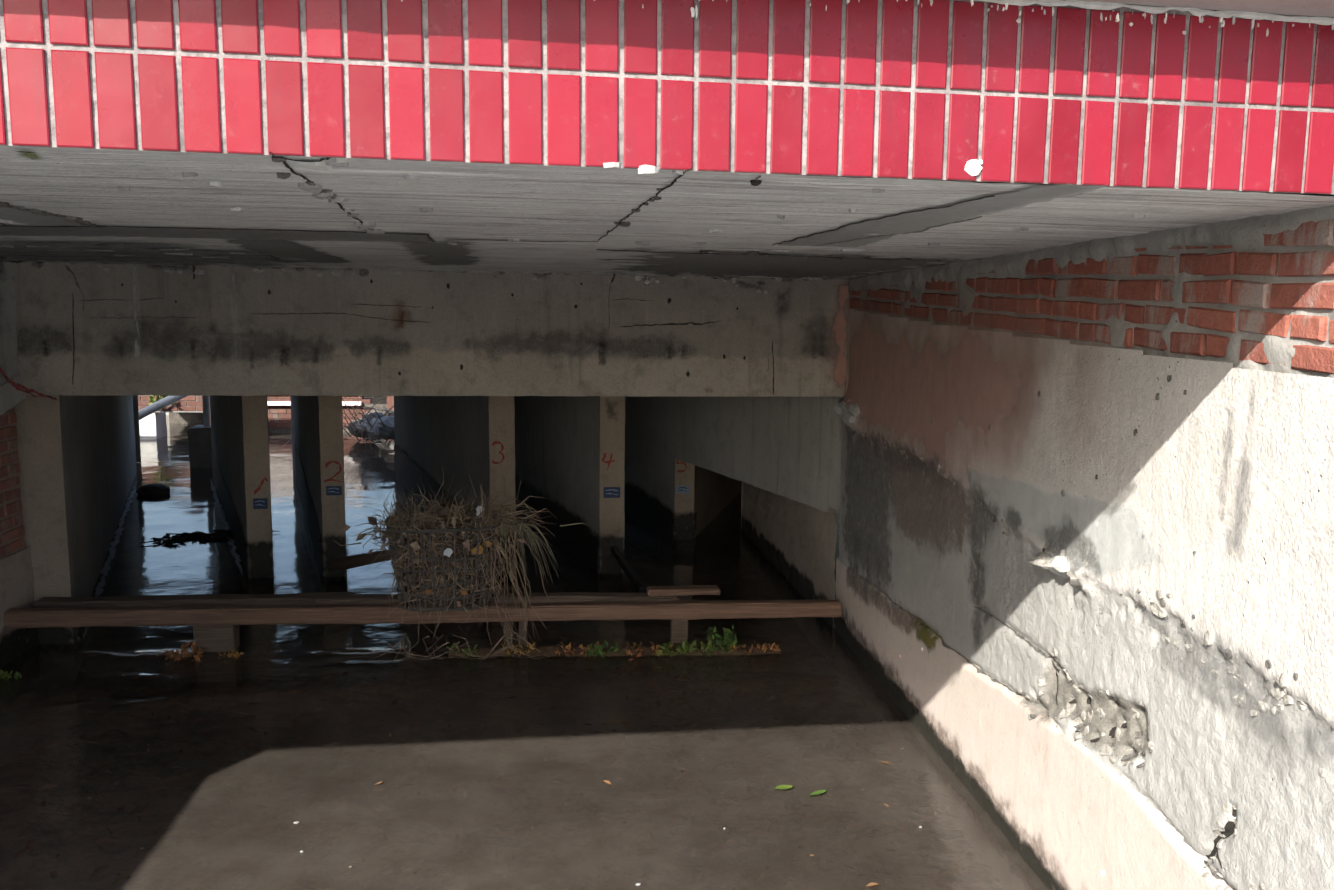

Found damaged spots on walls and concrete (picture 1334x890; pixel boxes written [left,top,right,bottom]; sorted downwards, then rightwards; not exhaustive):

leakage [0,225,479,358]
crack [269,152,384,234]
crack [452,166,693,242]
peeling [638,165,684,175]
leakage [597,249,959,279]
spalling [815,216,982,252]
leakage [843,425,891,606]
leakage [968,487,1021,644]
leakage [1044,522,1099,578]
spalling [837,423,1334,890]
crack [1202,804,1237,890]